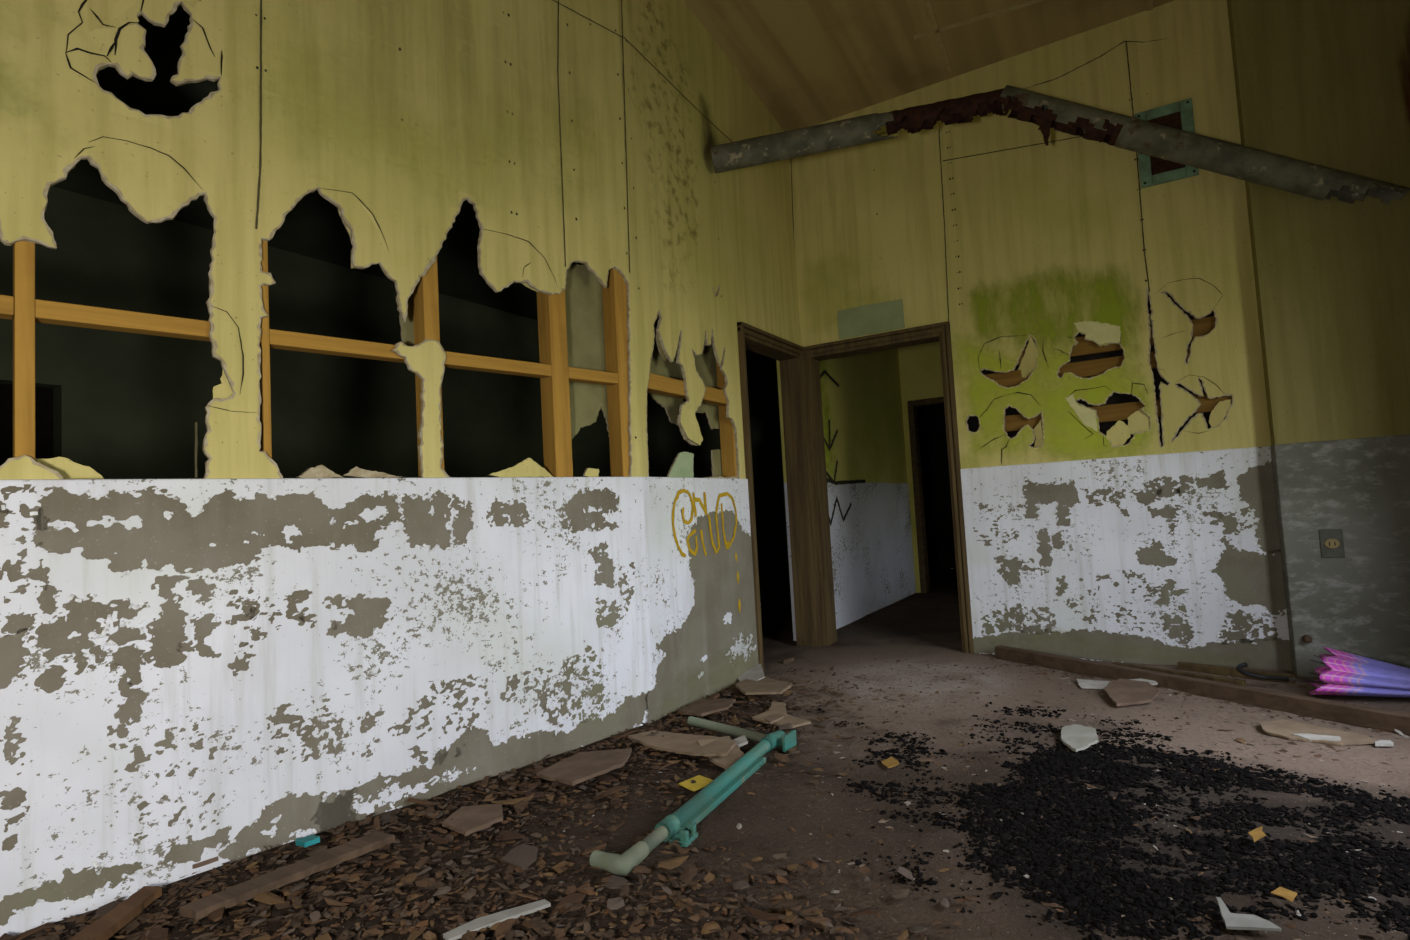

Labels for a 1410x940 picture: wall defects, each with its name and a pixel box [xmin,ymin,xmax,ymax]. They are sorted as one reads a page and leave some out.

spalling [965,278,1234,464]
peeling [0,136,761,869]
peeling [973,461,1293,671]
peeling [0,860,143,928]